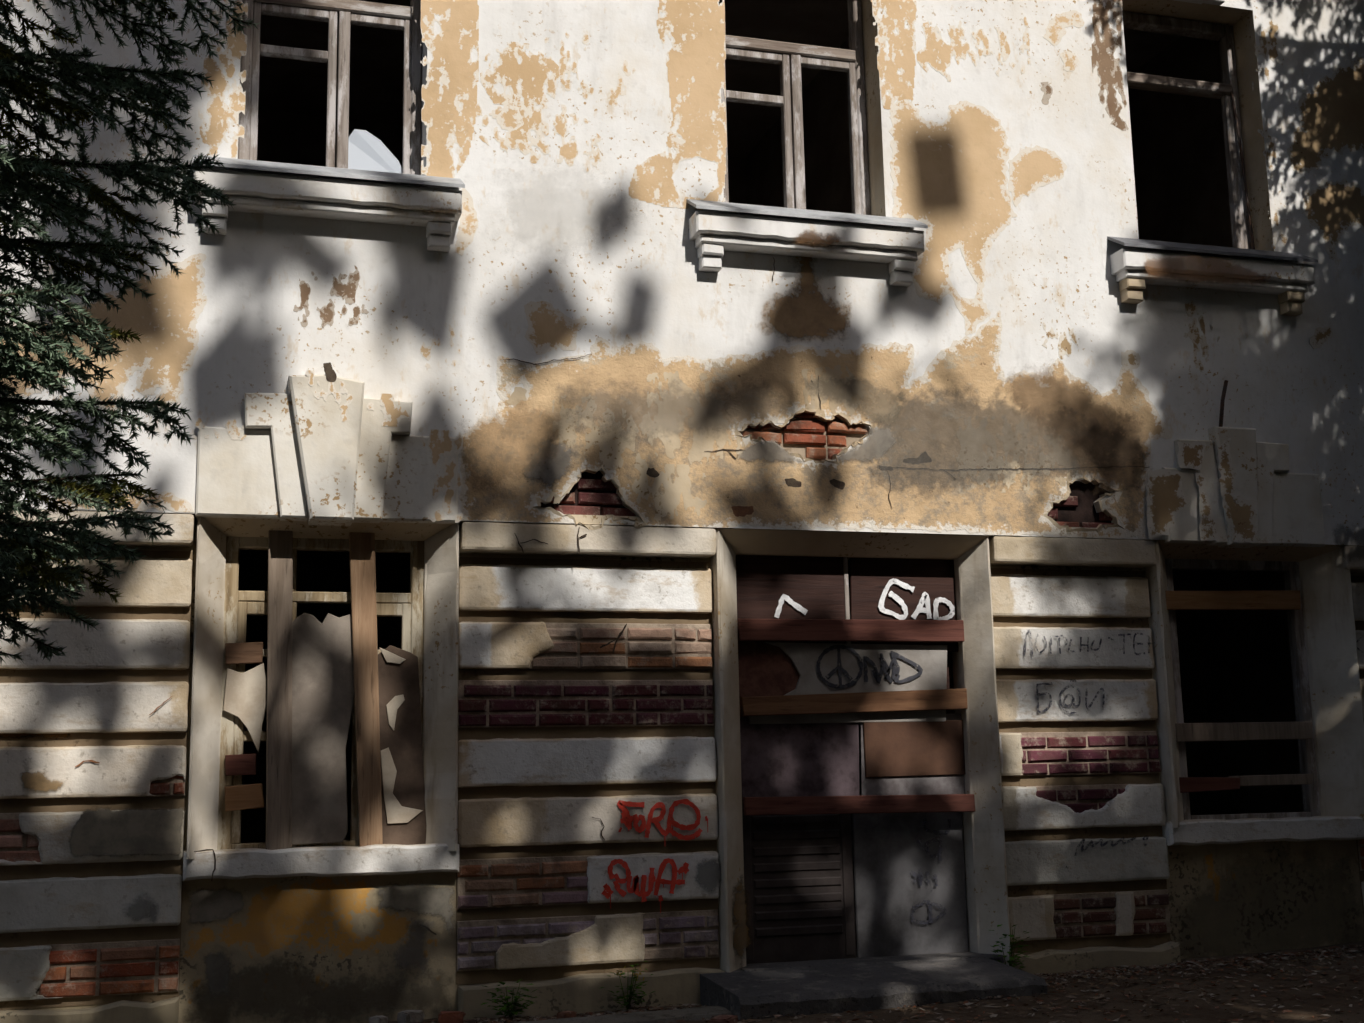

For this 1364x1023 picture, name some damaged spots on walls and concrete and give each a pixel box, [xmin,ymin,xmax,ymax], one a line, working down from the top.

peeling [1252,20,1285,95]
peeling [1258,57,1364,260]
peeling [0,253,207,411]
peeling [305,0,1257,544]
flaking render [0,812,51,866]
peeling [25,875,417,1005]
flaking render [457,855,598,972]